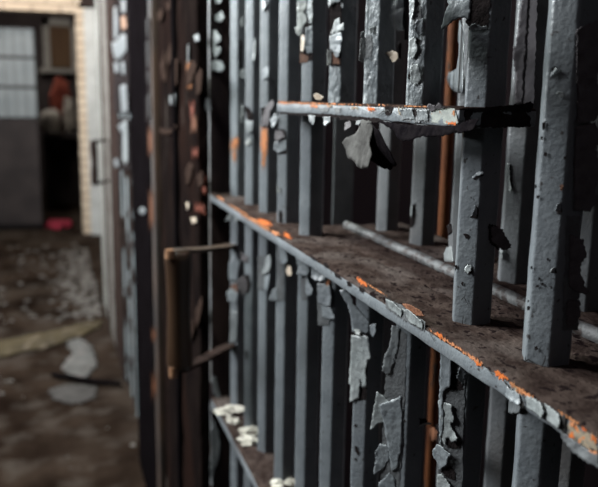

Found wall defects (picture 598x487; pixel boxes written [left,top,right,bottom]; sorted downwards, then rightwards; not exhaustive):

rust [279,101,359,110]
peeling [261,0,538,170]
rust [232,205,291,239]
rust [430,330,483,369]
peeling [370,325,407,487]
peeling [419,353,466,487]
rust [494,370,534,399]
rust [558,410,597,454]